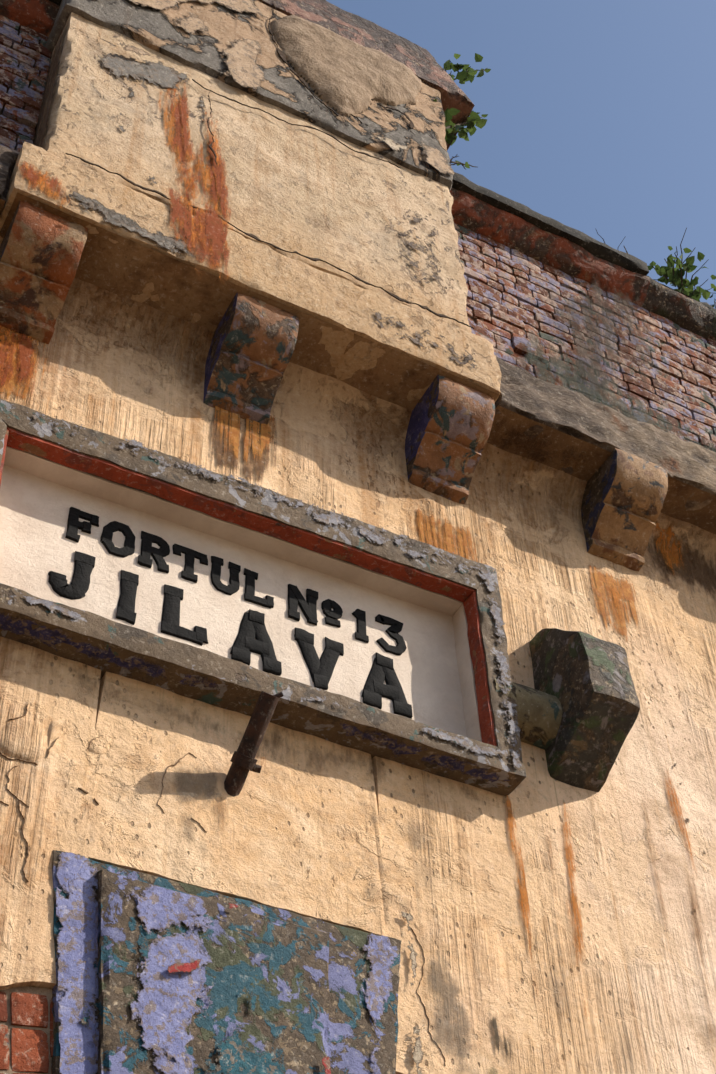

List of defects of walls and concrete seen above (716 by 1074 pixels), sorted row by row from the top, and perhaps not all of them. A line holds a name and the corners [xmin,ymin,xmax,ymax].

peeling [220,38,265,89]
corrosion [159,86,233,275]
crack [65,153,474,329]
peeling [371,135,455,175]
corrosion [0,325,48,399]
corrosion [211,406,277,481]
crack [0,766,29,882]
peeling [56,852,99,1074]
peeling [123,884,291,1074]
peeling [360,911,445,1074]
corrosion [506,795,532,959]
corrosion [563,802,583,961]